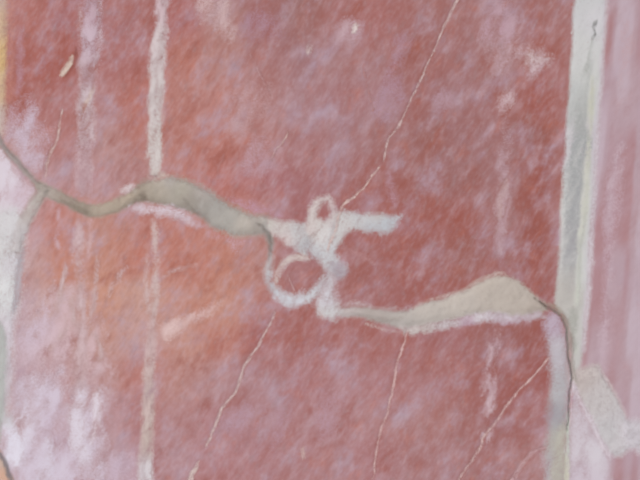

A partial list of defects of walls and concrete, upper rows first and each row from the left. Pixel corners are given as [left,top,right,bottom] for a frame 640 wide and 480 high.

crack [0,109,275,260]
crack [326,0,458,252]
crack [188,312,277,480]
crack [337,271,579,480]